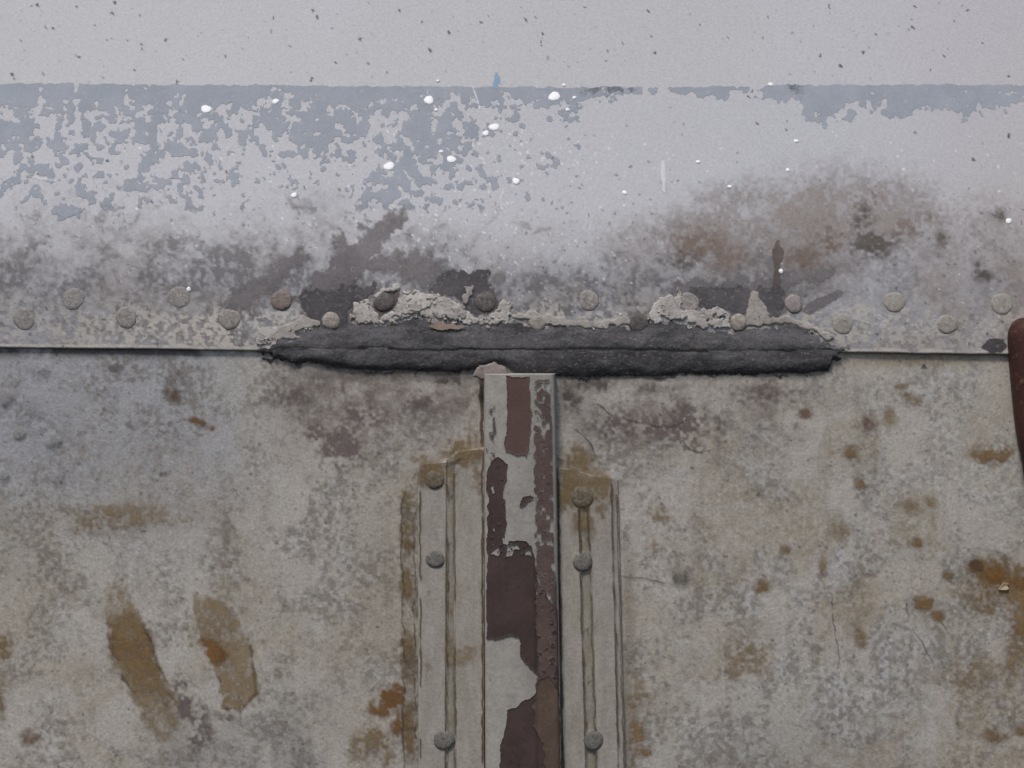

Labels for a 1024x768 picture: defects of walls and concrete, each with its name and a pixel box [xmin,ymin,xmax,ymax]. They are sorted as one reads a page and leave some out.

peeling [668,84,1024,129]
peeling [0,83,850,768]
corrosion [971,448,1011,464]
corrosion [108,591,178,736]
corrosion [194,598,259,710]
corrosion [969,558,1024,670]
corrosion [353,683,415,764]